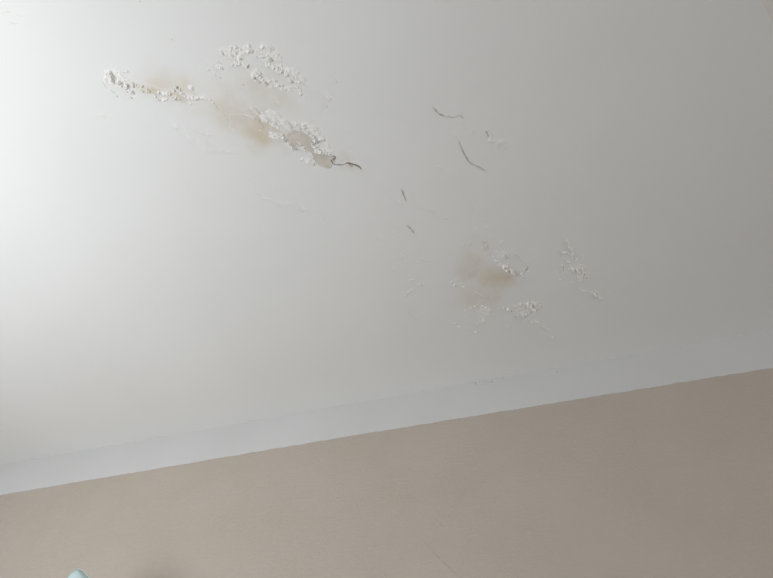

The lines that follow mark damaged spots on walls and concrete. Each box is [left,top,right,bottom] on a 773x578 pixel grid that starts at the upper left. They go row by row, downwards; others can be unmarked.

peeling [102,66,219,110]
damp [113,52,325,170]
peeling [207,43,310,98]
peeling [244,98,336,169]
crack [331,156,361,169]
damp [329,145,371,179]
damp [434,231,545,321]